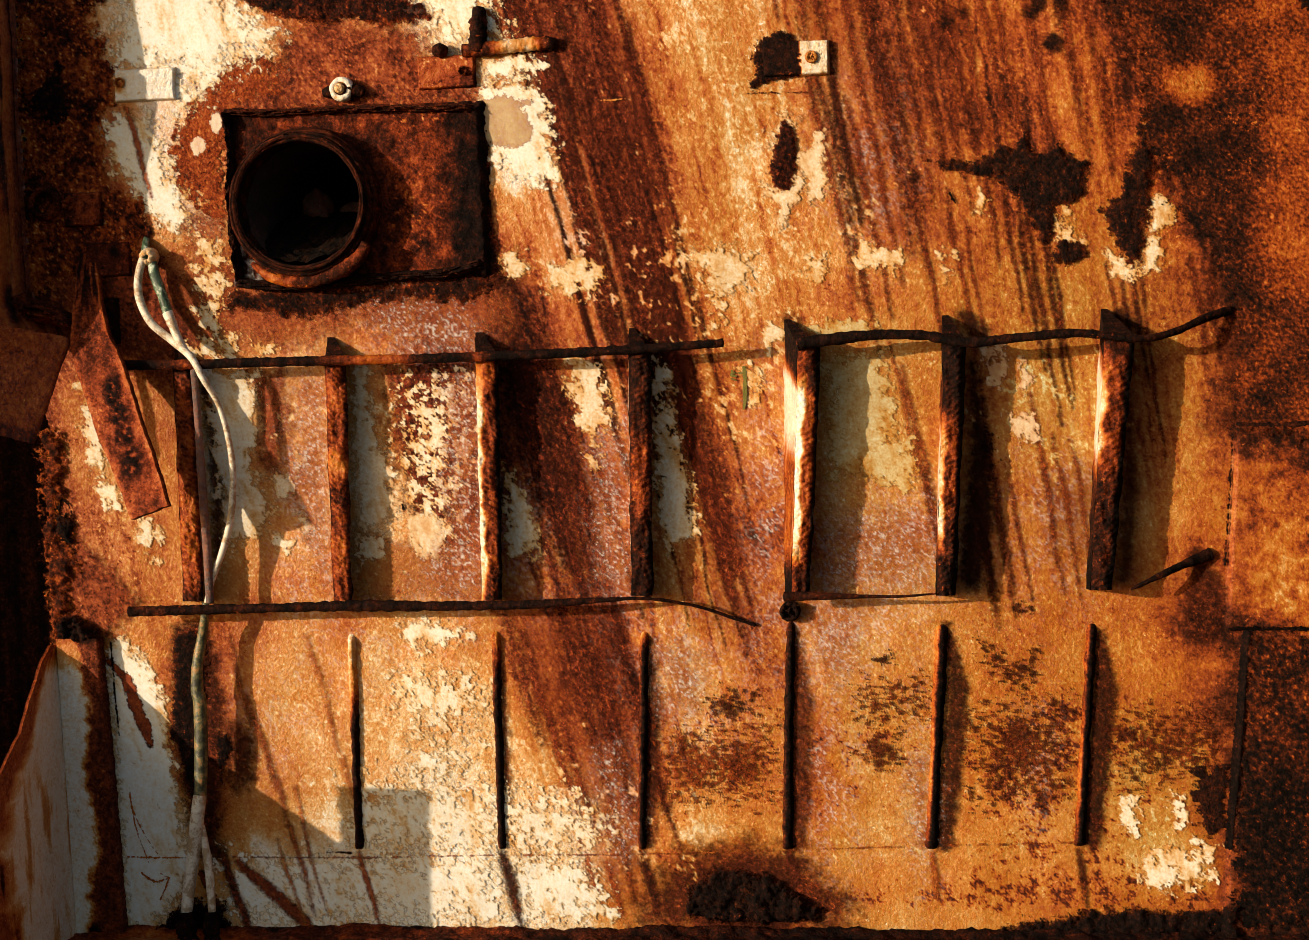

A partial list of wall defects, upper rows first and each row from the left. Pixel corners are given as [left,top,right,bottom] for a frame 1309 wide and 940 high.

peeling [99,0,565,569]
rust [794,0,1089,620]
peeling [972,185,992,217]
peeling [1053,193,1177,284]
rust [1021,0,1309,462]
peeling [71,374,166,567]
rust [15,0,859,930]
rust [1184,547,1226,641]
peeling [105,634,188,926]
rust [929,622,969,901]
rust [1000,630,1309,938]
peeling [1117,788,1225,898]